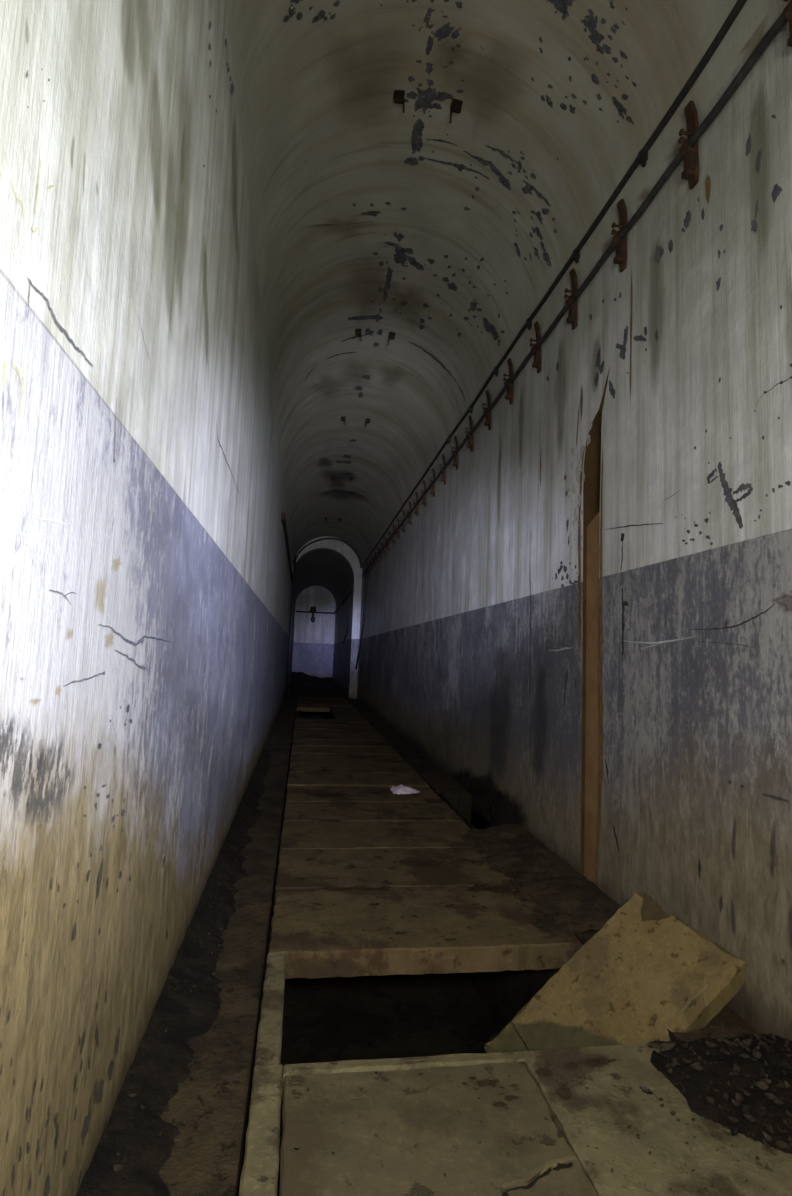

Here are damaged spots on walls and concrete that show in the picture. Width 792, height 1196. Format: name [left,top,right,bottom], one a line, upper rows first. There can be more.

peeling [283,0,340,23]
peeling [541,0,636,124]
peeling [404,0,557,267]
crack [27,277,93,366]
peeling [305,232,508,380]
crack [64,624,170,686]
crack [503,1162,573,1196]